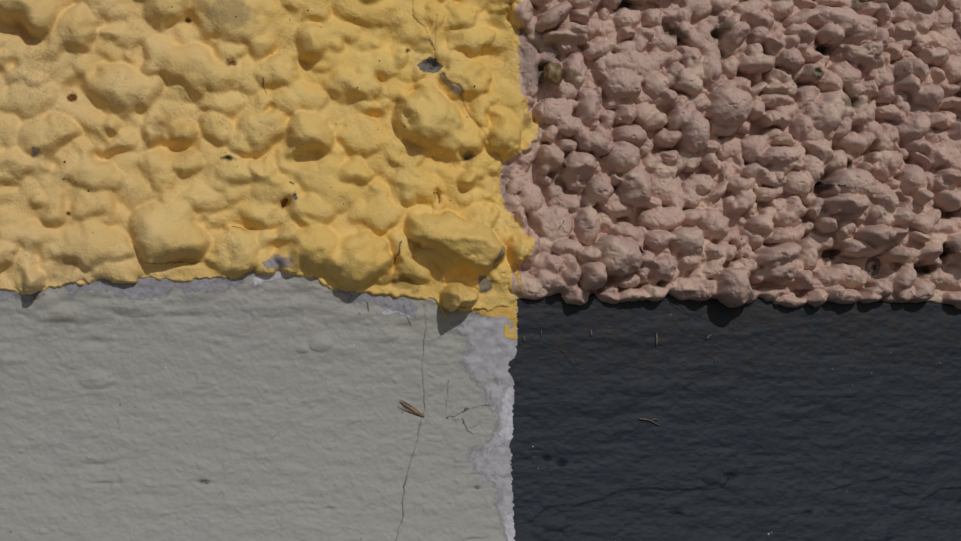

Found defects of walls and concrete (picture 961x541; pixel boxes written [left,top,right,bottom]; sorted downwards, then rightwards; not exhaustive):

peeling [0,290,43,302]
peeling [66,255,296,300]
peeling [338,290,417,319]
peeling [454,309,525,541]